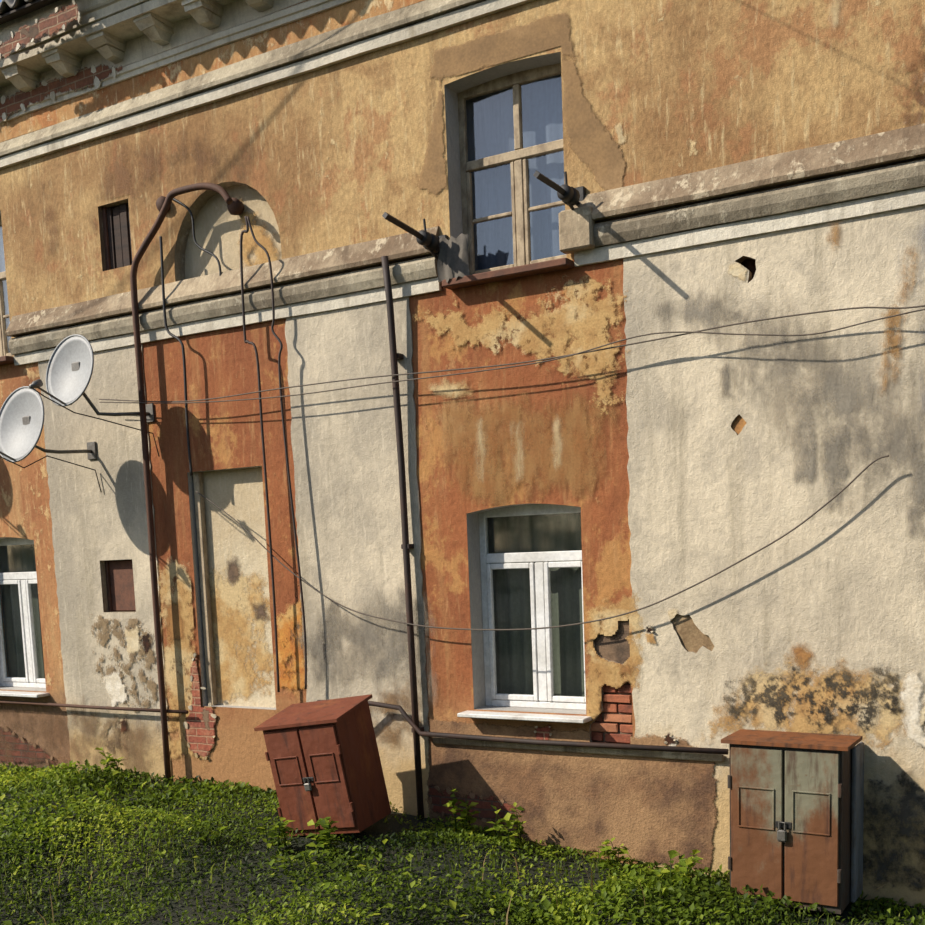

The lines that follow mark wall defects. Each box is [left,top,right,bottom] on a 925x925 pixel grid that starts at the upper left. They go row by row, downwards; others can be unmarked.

flaking render [0,0,82,60]
flaking render [0,64,123,121]
leakage [902,27,925,124]
peeling [412,275,626,414]
leakage [684,293,740,331]
spalling [728,256,756,283]
flaking render [731,415,746,435]
leakage [744,328,925,534]
peeling [89,557,305,760]
peeling [585,596,656,744]
flaking render [668,609,714,653]
peeling [710,646,925,749]